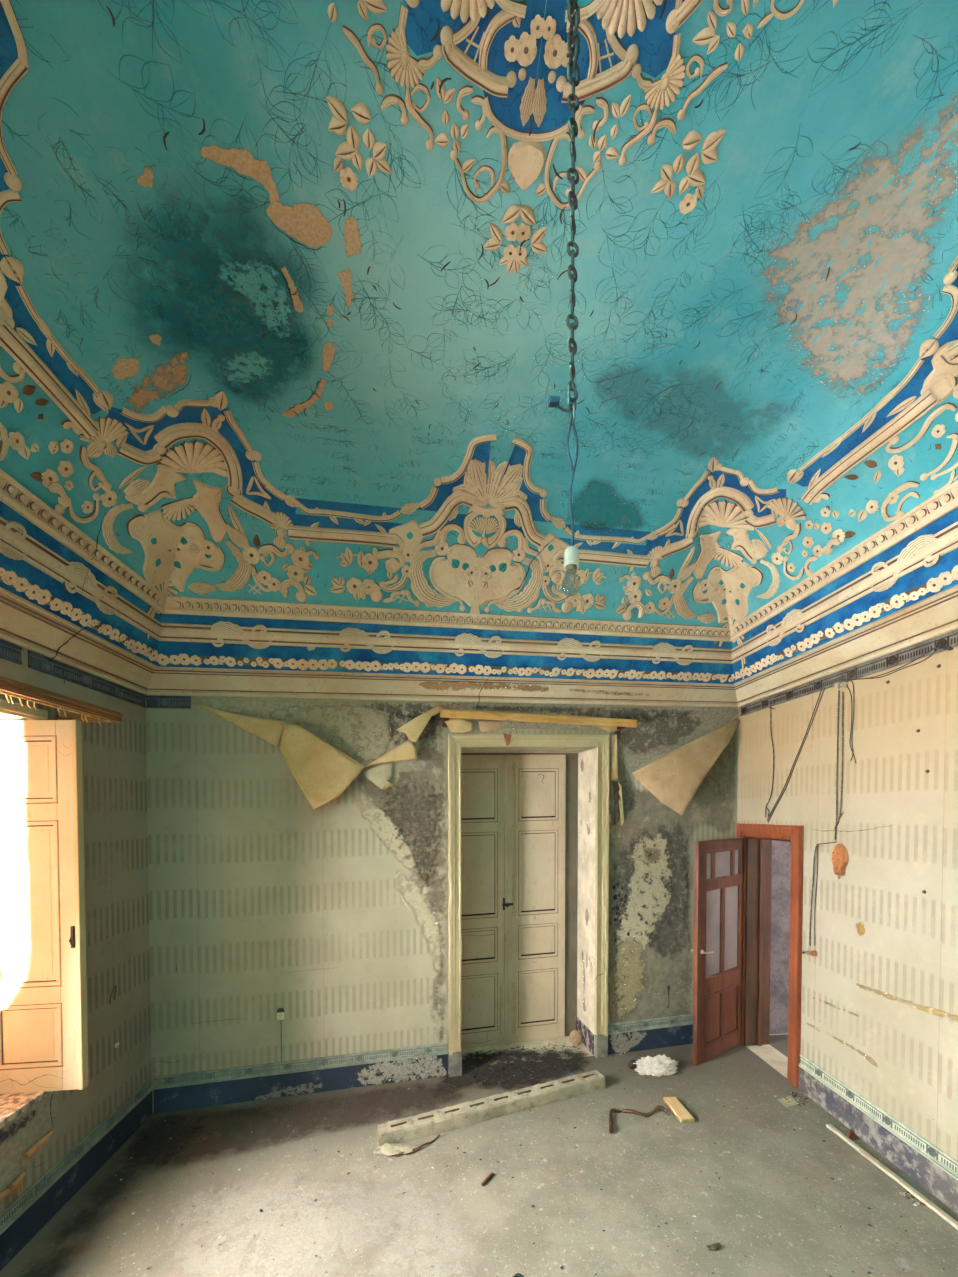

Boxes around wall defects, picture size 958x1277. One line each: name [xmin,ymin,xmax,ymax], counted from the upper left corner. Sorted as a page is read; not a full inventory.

peeling [137,164,154,188]
leakage [132,208,310,396]
peeling [198,119,362,420]
peeling [111,352,192,413]
flaking render [196,682,739,810]
flaking render [0,1091,60,1193]